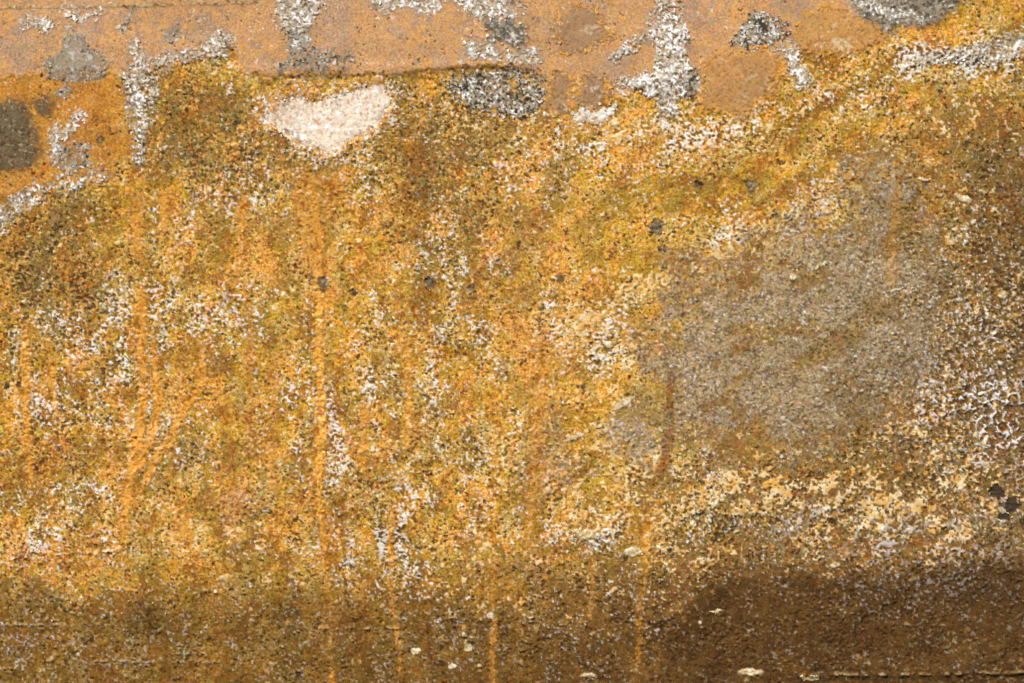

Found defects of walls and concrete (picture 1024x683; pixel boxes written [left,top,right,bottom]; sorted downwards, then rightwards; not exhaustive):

damp [0,96,114,236]
damp [119,26,238,171]
peeling [247,62,410,170]
damp [368,0,547,122]
damp [608,0,709,119]
corrosion [20,330,60,489]
corrosion [119,292,207,535]
corrosion [298,181,339,617]
corrosion [404,337,414,450]
corrosion [387,509,402,672]
corrosion [636,526,651,625]
damp [666,567,1024,683]